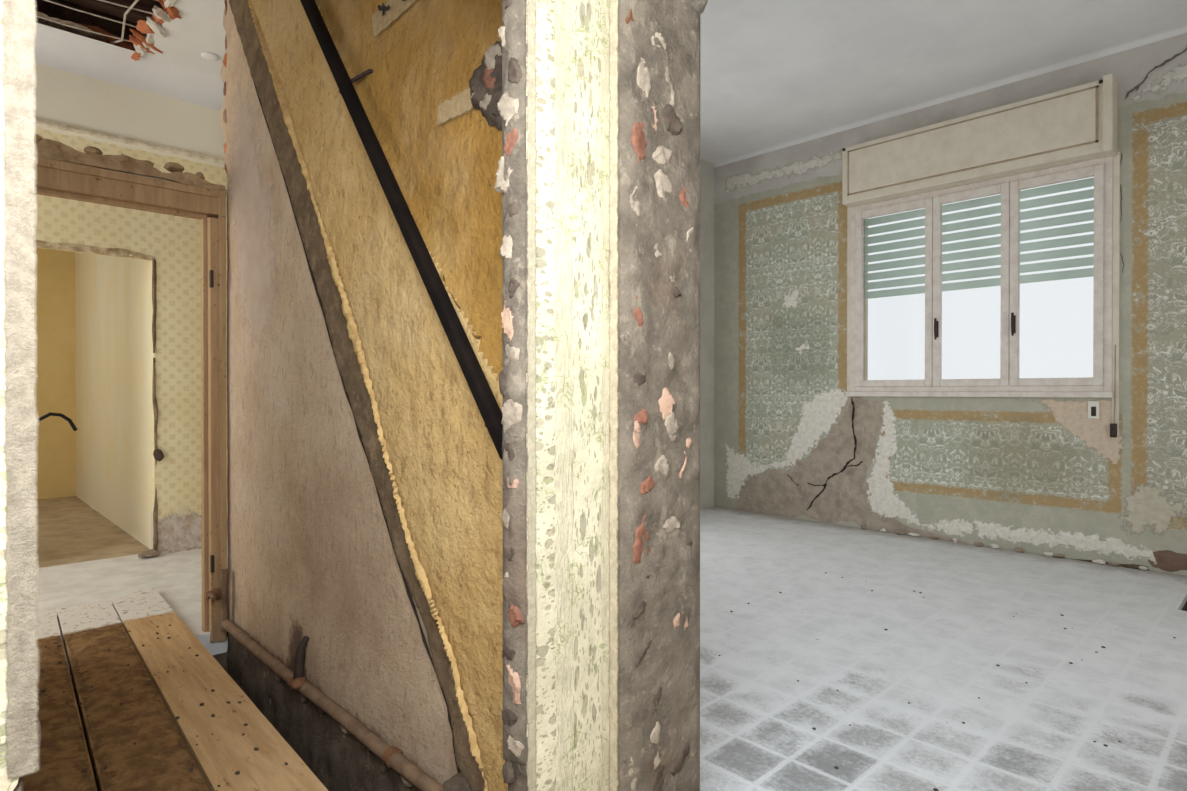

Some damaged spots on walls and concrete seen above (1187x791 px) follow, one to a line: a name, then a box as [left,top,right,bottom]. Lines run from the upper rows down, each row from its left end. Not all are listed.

crack [1124,48,1187,100]
peeling [725,150,843,194]
spalling [226,0,488,791]
flaking render [469,0,528,784]
flaking render [619,0,701,791]
crack [787,398,863,511]
spalling [735,396,1000,549]
spalling [1043,551,1149,571]